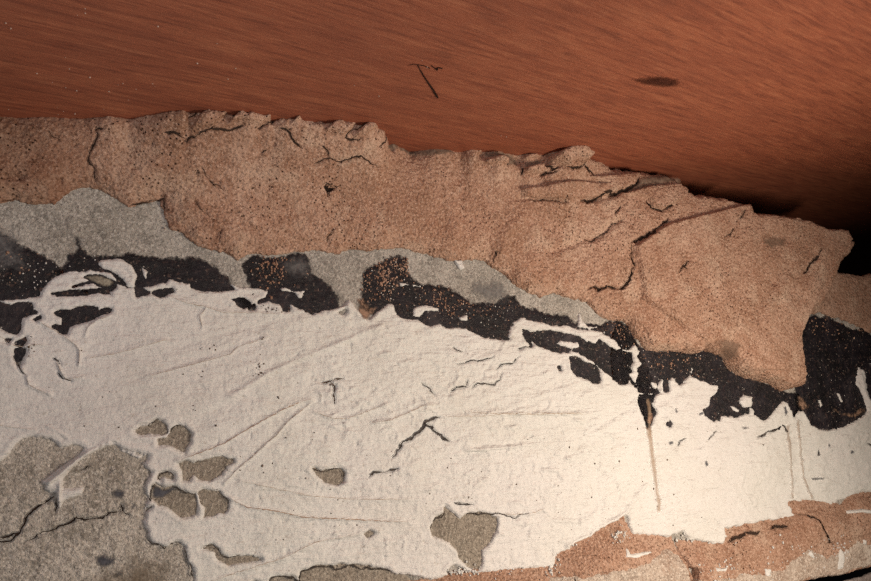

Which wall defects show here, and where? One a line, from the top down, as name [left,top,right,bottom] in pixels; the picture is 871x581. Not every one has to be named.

crack [88,128,103,179]
crack [166,113,387,168]
crack [422,346,530,393]
crack [369,416,450,477]
crack [0,496,129,543]
peeling [0,419,234,581]
peeling [430,506,497,569]
spalling [549,548,701,581]
spalling [716,539,871,581]